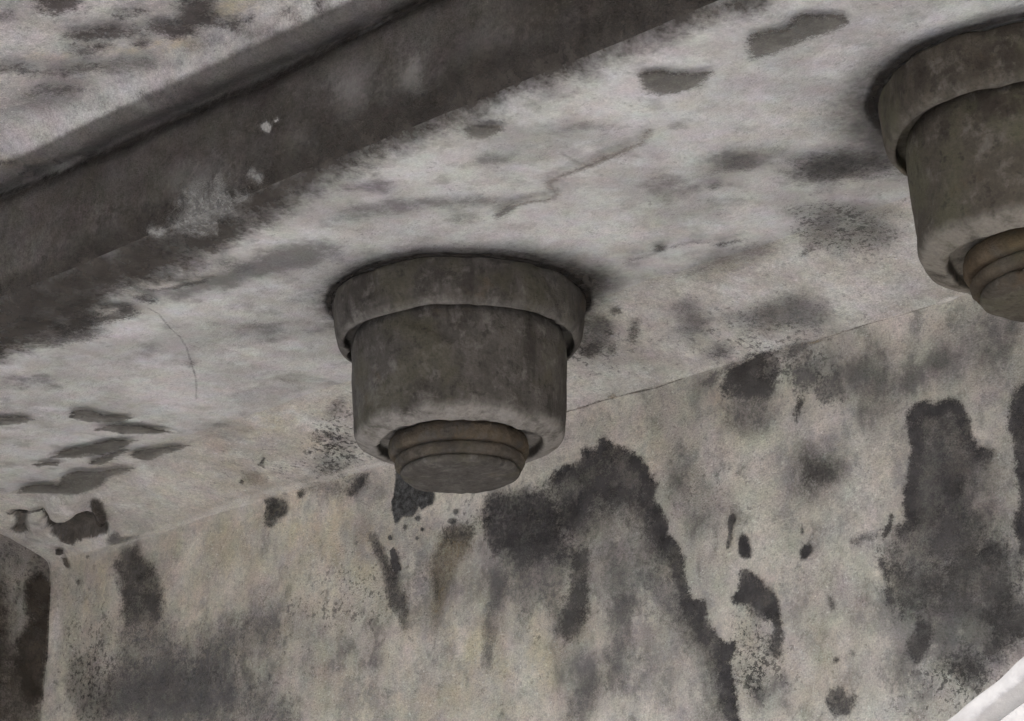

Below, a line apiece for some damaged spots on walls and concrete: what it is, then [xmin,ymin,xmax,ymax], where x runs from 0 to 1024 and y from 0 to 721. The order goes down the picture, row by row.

crack [495,129,651,217]
damp [703,343,845,429]
damp [0,571,51,721]
damp [65,544,295,721]
damp [368,534,408,626]
damp [430,437,783,721]
damp [852,383,1024,693]